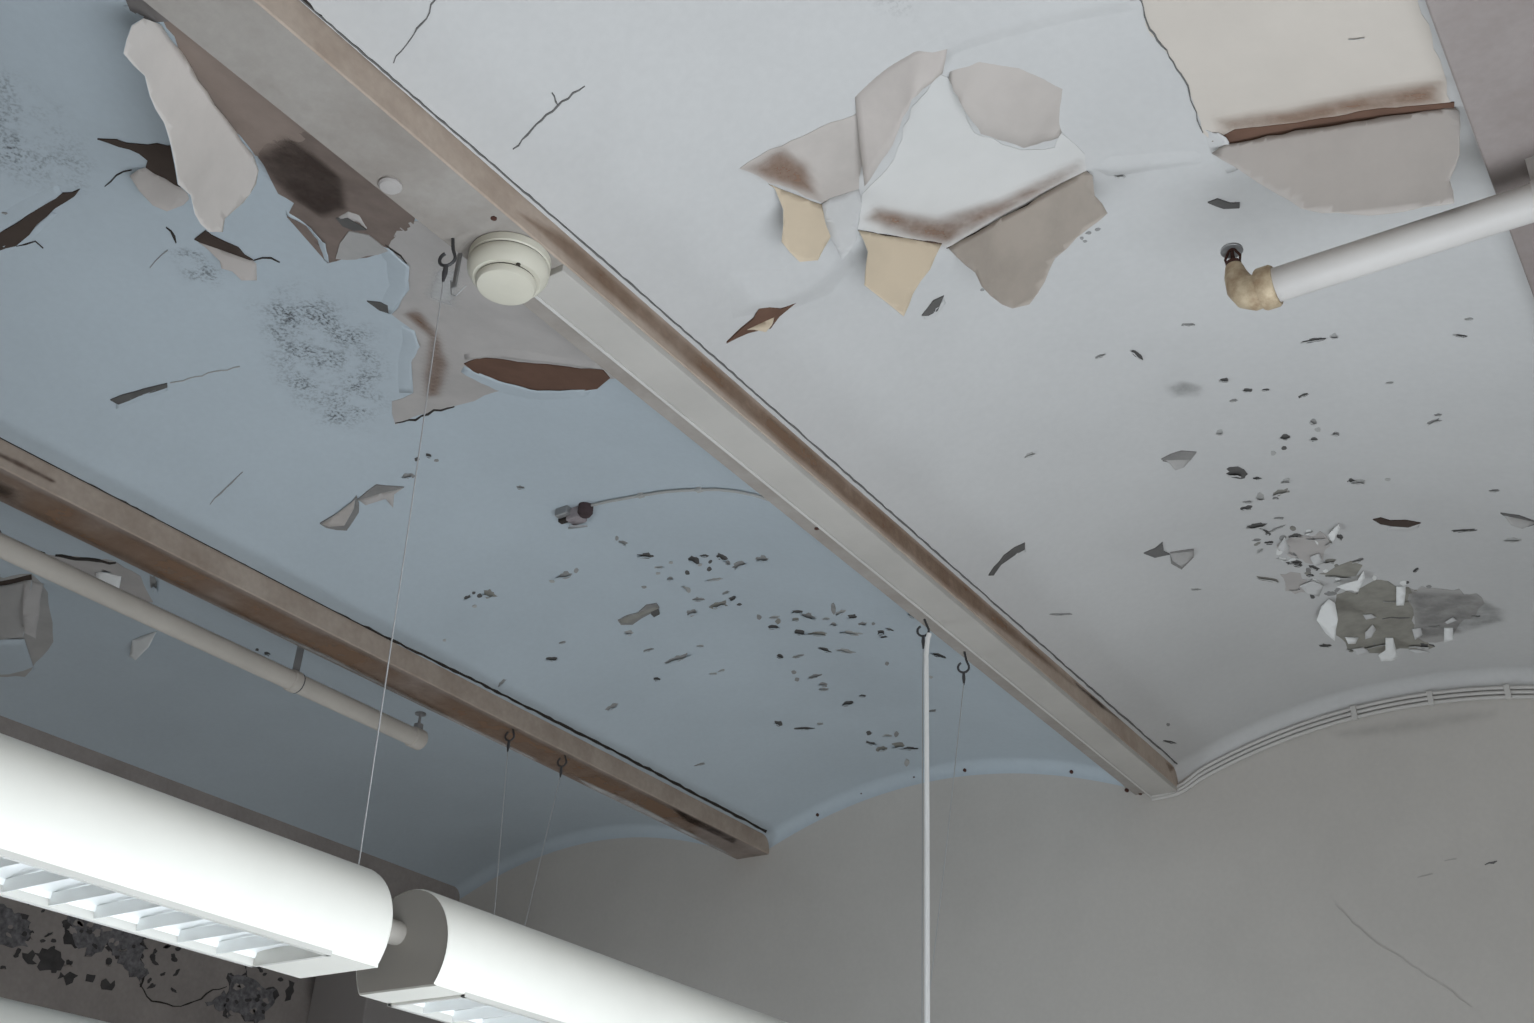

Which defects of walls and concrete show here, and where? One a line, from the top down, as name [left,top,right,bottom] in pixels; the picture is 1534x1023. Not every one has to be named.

peeling [1130,0,1460,216]
crack [253,256,280,264]
peeling [123,0,615,425]
peeling [740,49,1108,317]
crack [170,366,240,383]
crack [301,0,1177,764]
peeling [0,574,53,677]
peeling [615,536,768,636]
peeling [757,603,894,691]
flaking render [1226,466,1484,661]
flaking render [0,904,181,993]
flaking render [205,966,294,1023]